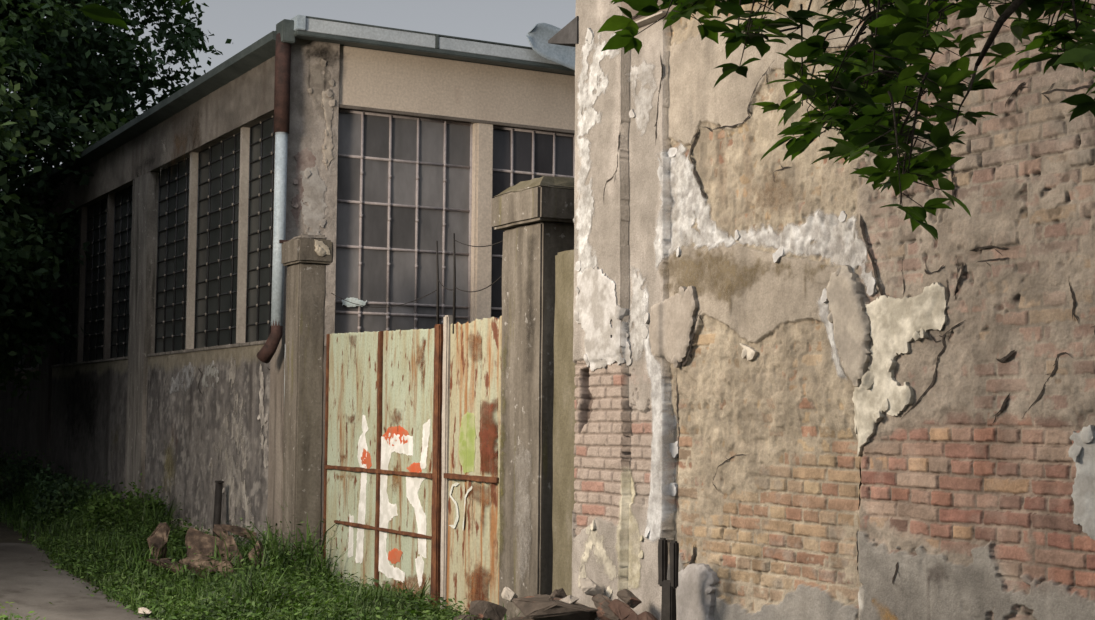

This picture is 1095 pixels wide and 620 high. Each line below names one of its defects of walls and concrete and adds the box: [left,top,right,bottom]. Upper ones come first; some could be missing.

peeling [291,59,335,256]
corrosion [469,337,482,359]
flaking render [572,28,1095,620]
crack [860,215,1009,418]
crack [997,350,1015,363]
crack [993,352,1074,423]
crack [1069,282,1095,334]
corrosion [469,399,498,525]
corrosion [384,574,426,599]
corrosion [466,566,490,601]